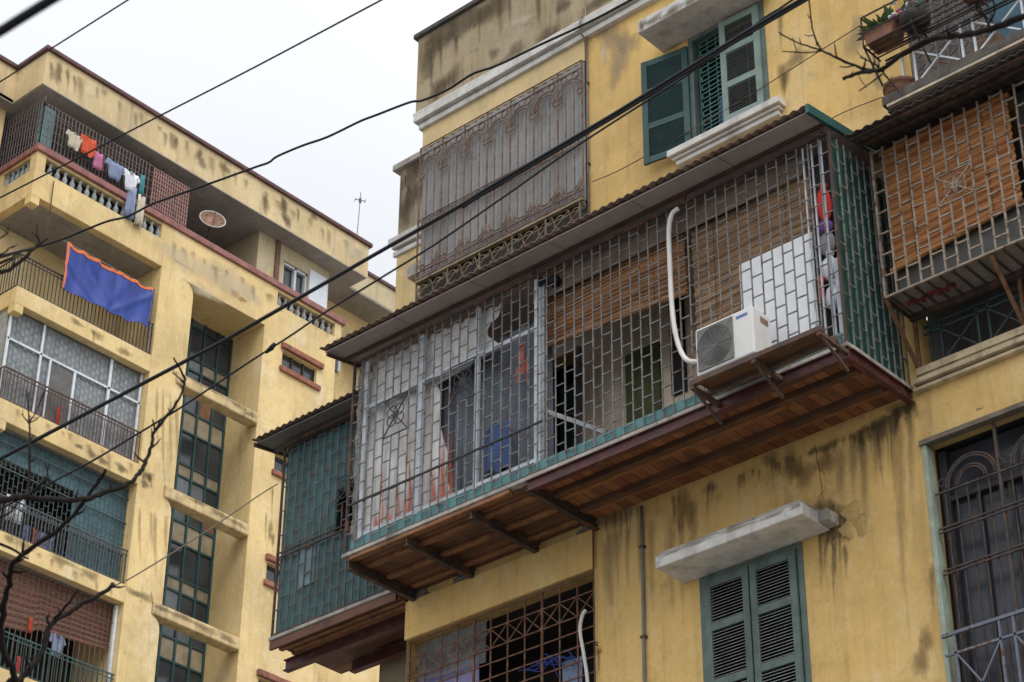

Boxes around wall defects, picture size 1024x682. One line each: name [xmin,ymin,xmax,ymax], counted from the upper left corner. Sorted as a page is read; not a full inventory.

damp [816,502,846,556]